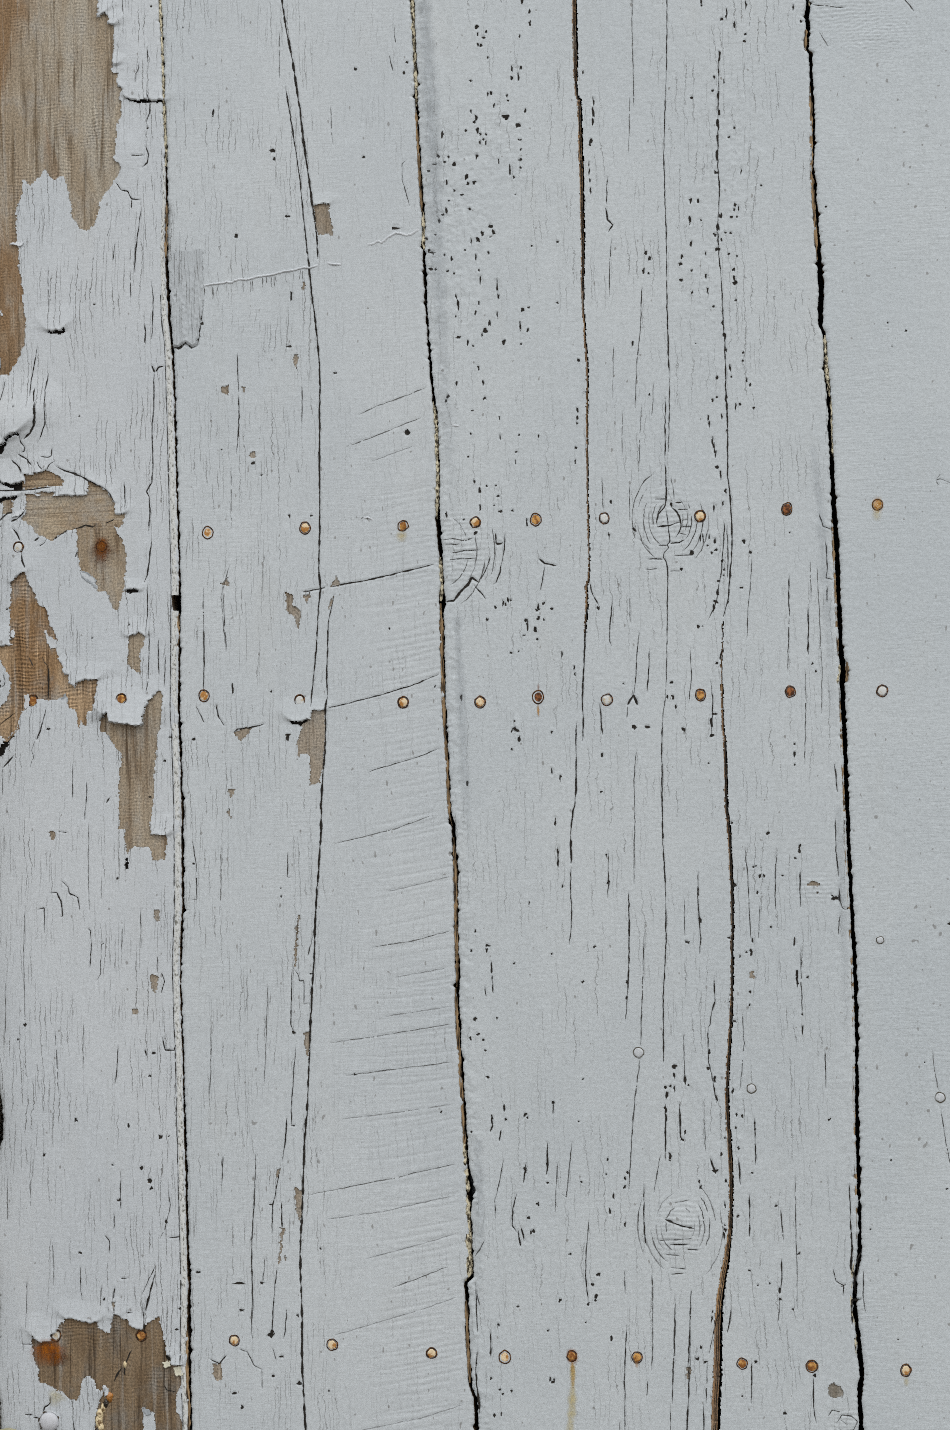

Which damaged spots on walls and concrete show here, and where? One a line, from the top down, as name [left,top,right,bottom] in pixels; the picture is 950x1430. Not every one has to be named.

peeling [0,0,122,376]
peeling [313,202,333,236]
peeling [424,131,530,347]
peeling [487,65,526,195]
peeling [1,470,127,610]
peeling [0,572,173,861]
crack [0,0,589,1430]
peeling [286,710,325,786]
crack [555,0,798,1430]
crack [745,515,848,938]
crack [833,1186,866,1324]
peeling [31,1298,183,1430]